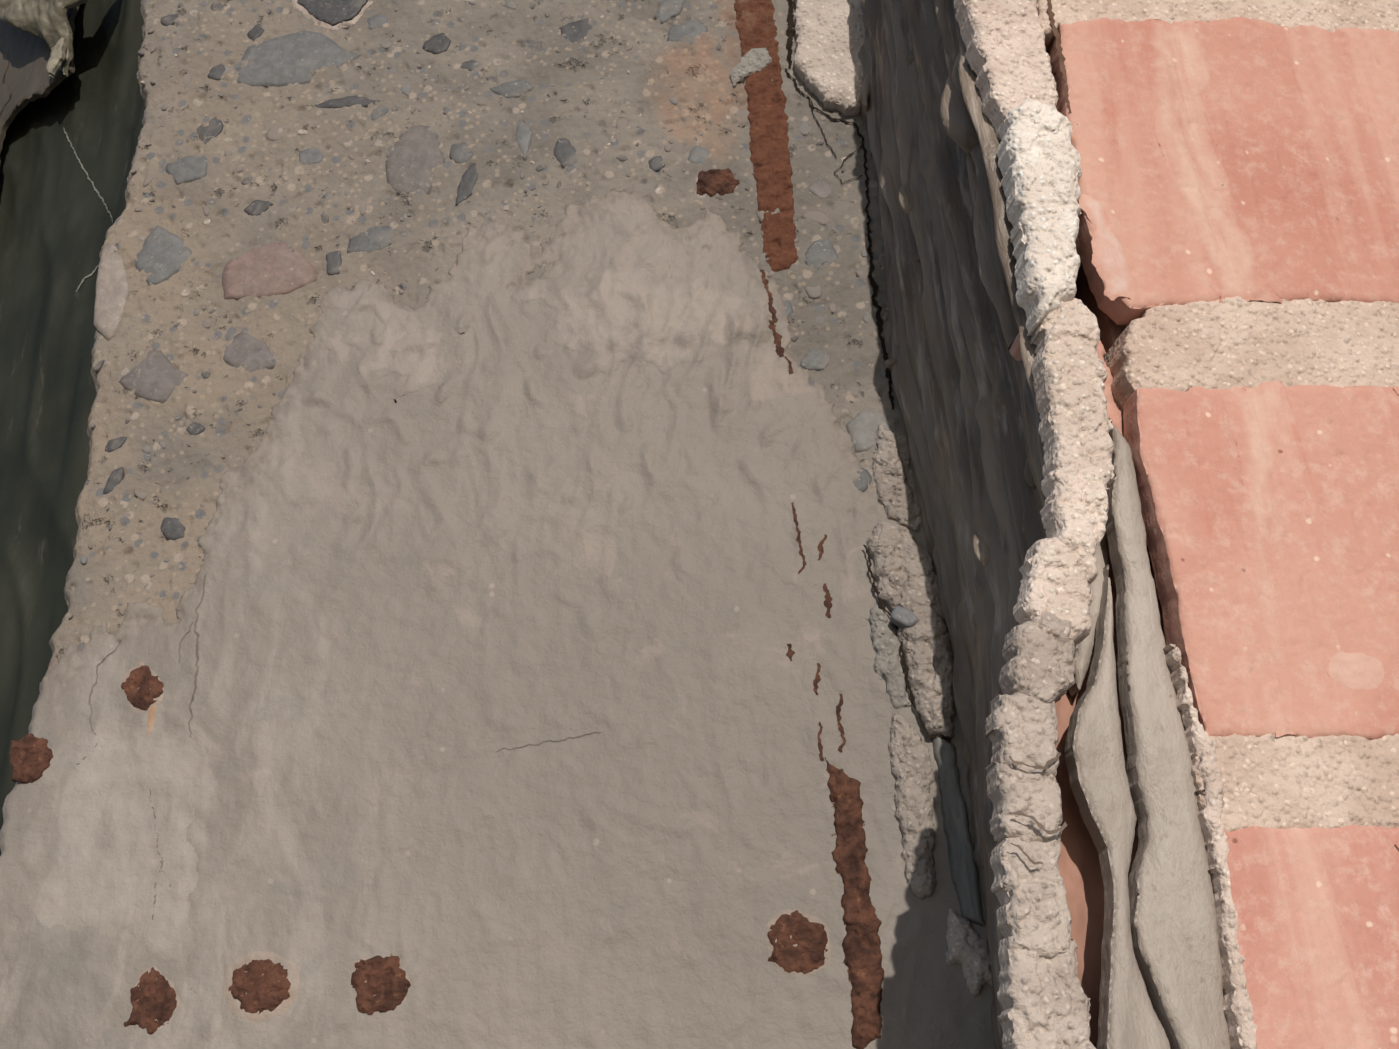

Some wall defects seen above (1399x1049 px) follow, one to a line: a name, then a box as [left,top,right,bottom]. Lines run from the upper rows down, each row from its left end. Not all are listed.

rust [636,0,749,197]
crack [1047,0,1072,113]
crack [785,0,894,410]
spalling [45,0,956,900]
rust [9,733,53,783]
rust [121,662,164,735]
peeling [945,424,1231,1049]
rust [124,965,180,1035]
rust [222,951,301,1023]
rust [350,953,411,1015]
rust [765,909,833,975]
spalling [825,758,884,1049]